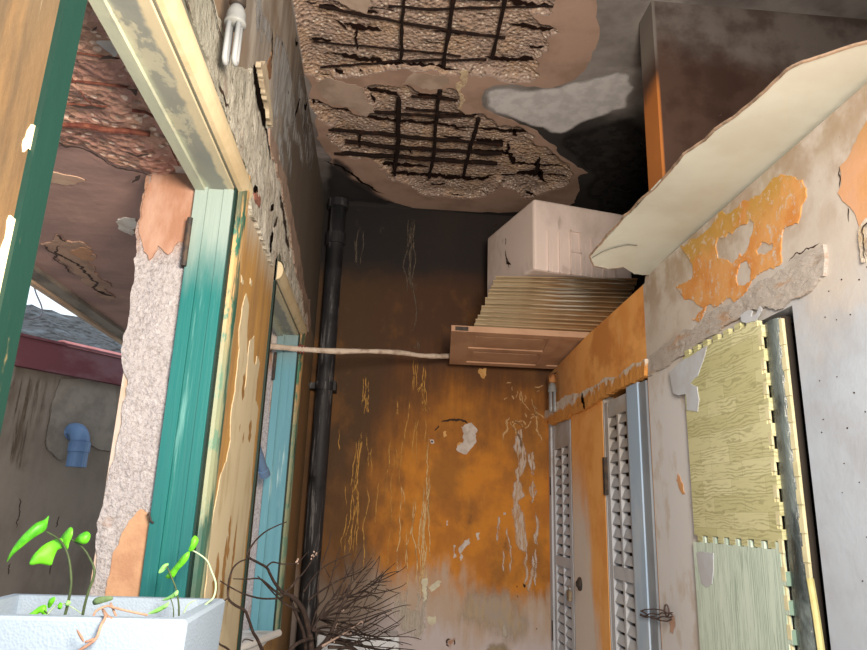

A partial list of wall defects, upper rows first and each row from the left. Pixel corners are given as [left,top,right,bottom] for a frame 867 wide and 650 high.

flaking render [59,0,195,597]
flaking render [185,0,311,332]
spalling [293,0,600,213]
peeling [676,174,807,322]
peeling [838,121,867,227]
peeling [204,275,273,650]
damp [340,437,379,565]
damp [387,361,430,637]
peeling [434,418,478,454]
peeling [453,533,480,561]
peeling [496,429,539,591]
damp [503,382,544,446]